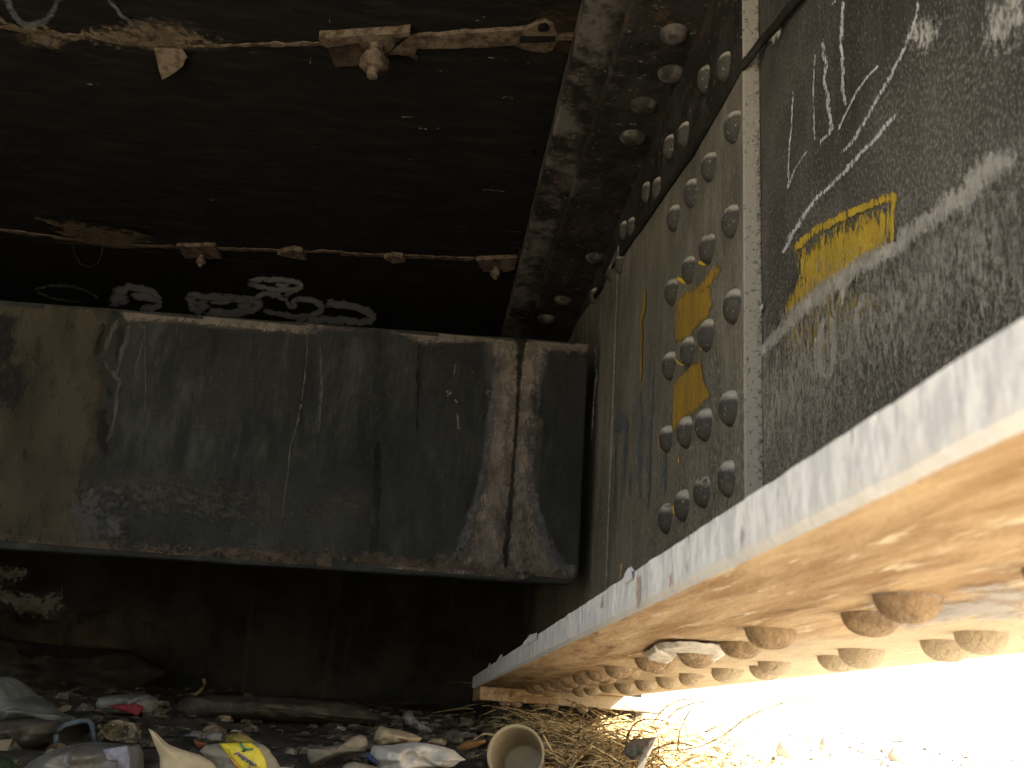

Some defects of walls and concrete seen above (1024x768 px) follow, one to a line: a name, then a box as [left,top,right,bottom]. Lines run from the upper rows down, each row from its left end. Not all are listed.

rust [0,16,224,50]
rust [34,217,153,249]
damp [0,305,392,553]
rust [1,339,586,580]
damp [399,333,503,559]
crack [502,338,527,568]
damp [527,340,597,575]